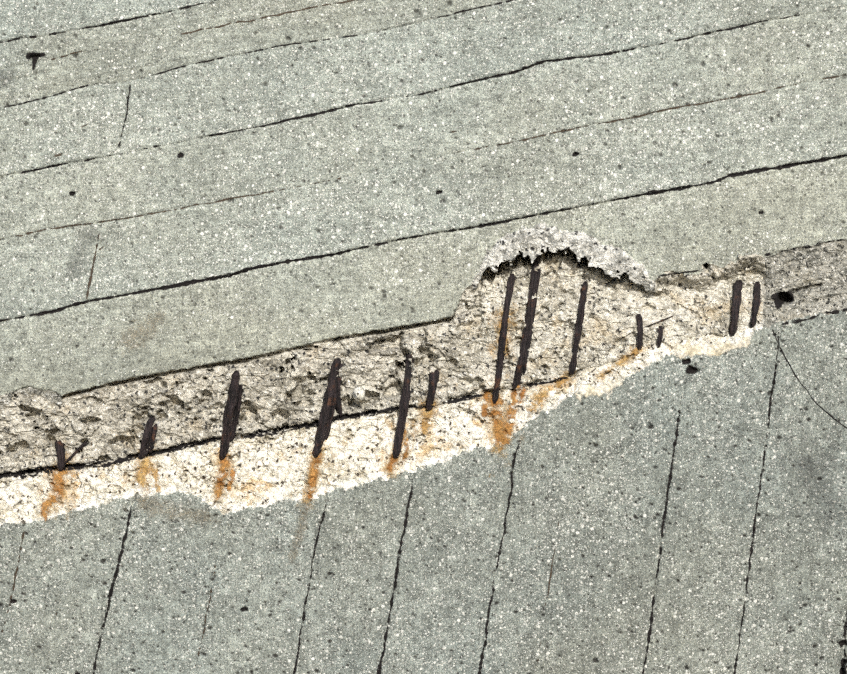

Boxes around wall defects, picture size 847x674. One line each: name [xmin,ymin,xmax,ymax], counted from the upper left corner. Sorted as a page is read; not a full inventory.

crack [406,48,635,97]
crack [206,100,383,137]
crack [0,154,847,322]
rust [41,470,76,521]
rust [215,455,235,499]
rust [304,454,322,500]
spalling [0,247,794,526]
rust [387,424,409,472]
rust [482,385,525,451]
crack [733,308,847,674]
crack [642,410,681,674]
crack [377,486,413,674]